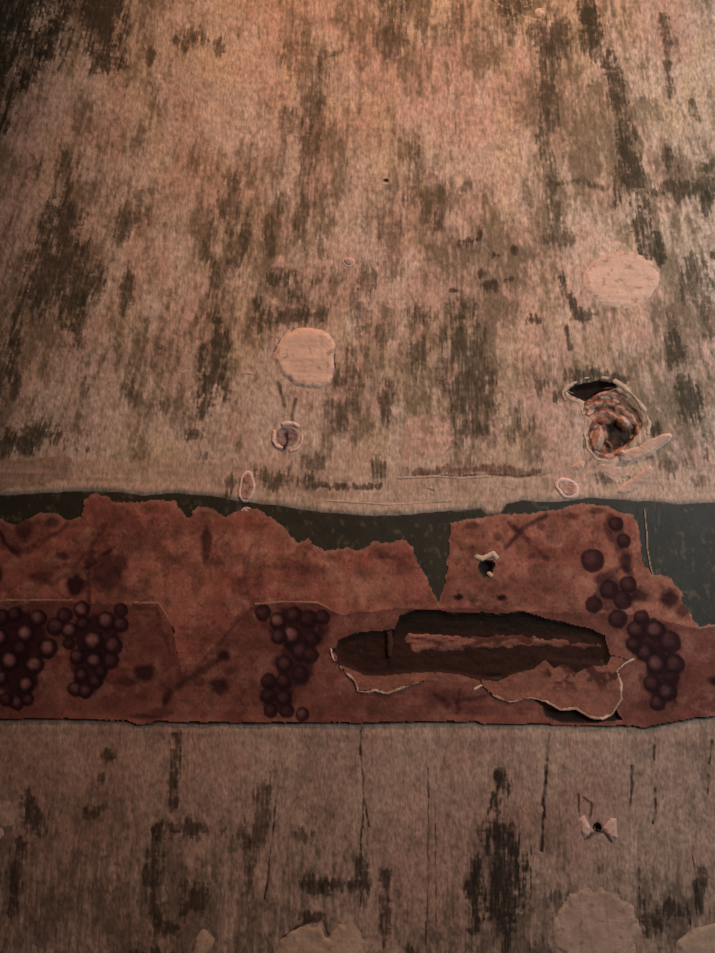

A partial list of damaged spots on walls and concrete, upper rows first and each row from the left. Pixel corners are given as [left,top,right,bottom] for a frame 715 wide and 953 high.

damp [0,0,129,133]
damp [500,0,715,266]
damp [0,193,106,400]
damp [558,275,593,350]
peeling [0,491,86,524]
damp [185,313,232,441]
peeling [105,492,453,601]
spalling [271,421,303,452]
spalling [475,551,499,561]
peeling [506,366,715,627]
damp [464,769,532,952]
flaking render [578,793,618,842]